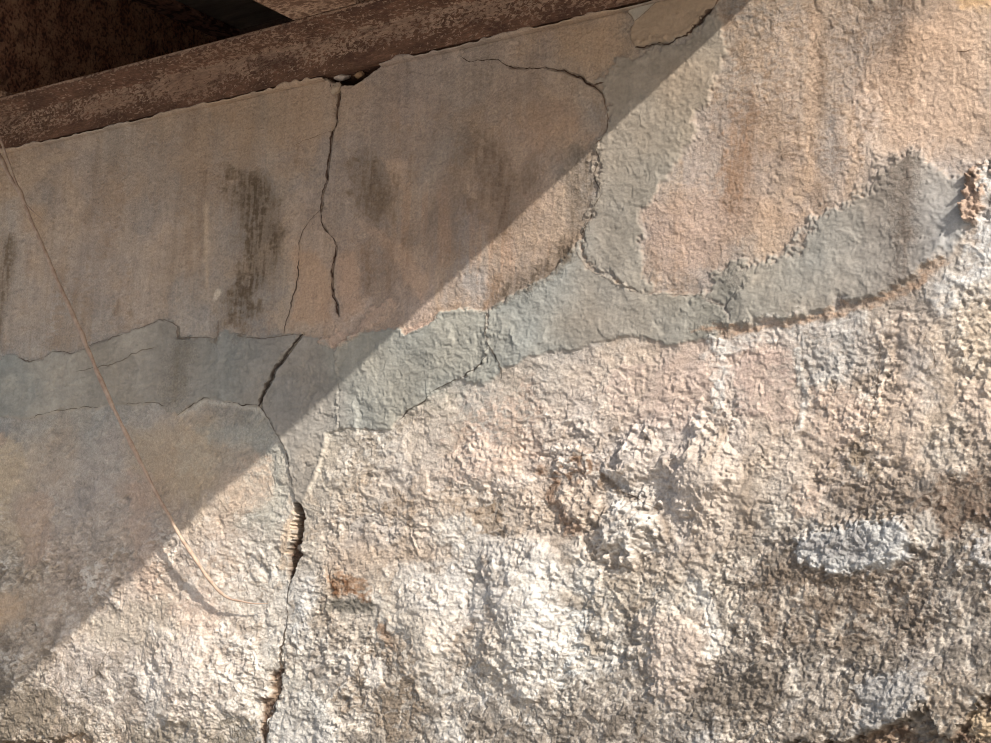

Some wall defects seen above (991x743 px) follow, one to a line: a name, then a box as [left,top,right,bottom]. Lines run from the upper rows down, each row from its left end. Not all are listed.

water stain [155,148,297,422]
water stain [329,130,419,302]
water stain [450,114,608,315]
crack [462,57,722,305]
crack [402,311,502,418]
spalling [0,728,93,743]
crack [266,584,290,740]
flaking render [257,657,345,743]
flaking render [680,713,741,743]
flaking render [782,660,991,743]